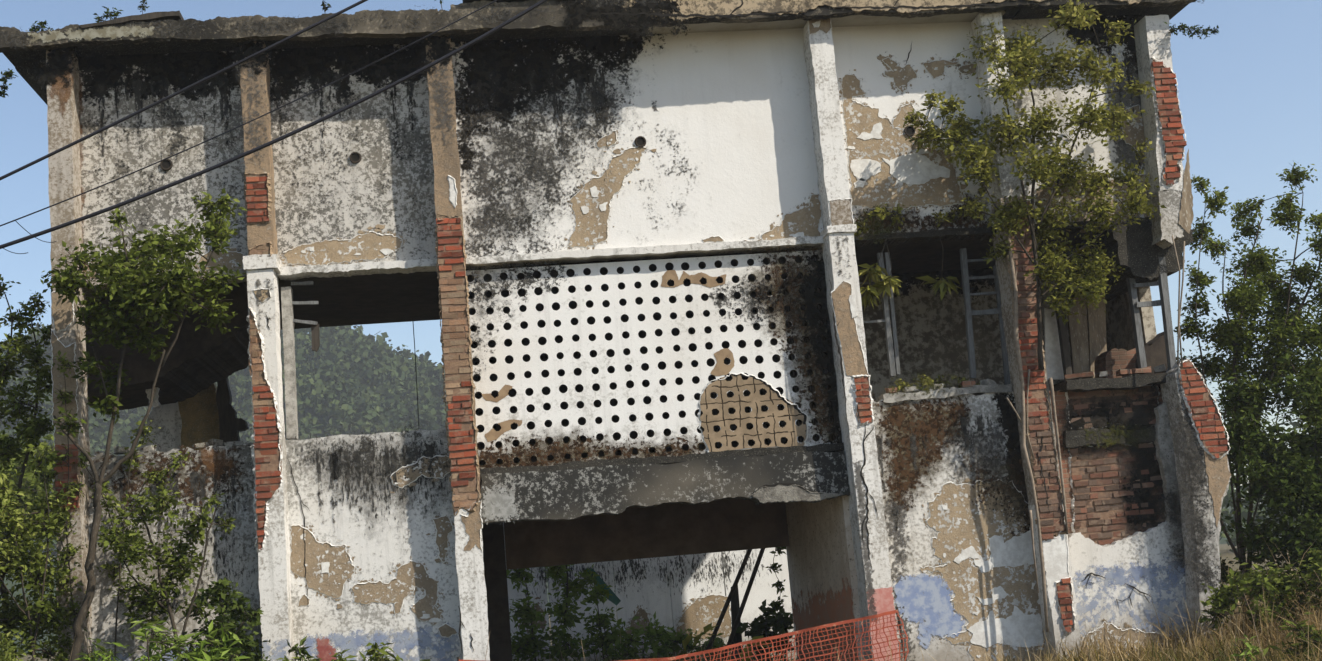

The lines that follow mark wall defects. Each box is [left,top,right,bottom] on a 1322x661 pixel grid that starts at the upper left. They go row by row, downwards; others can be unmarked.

leakage [0,0,690,392]
peeling [563,130,697,250]
peeling [741,52,978,252]
leakage [292,426,451,530]
flaking render [289,175,522,638]
leakage [477,431,707,525]
spalling [697,348,808,453]
leakage [709,191,995,452]
peeling [831,280,874,426]
leakage [853,460,879,622]
leakage [872,391,1030,661]
peeling [918,56,1194,661]